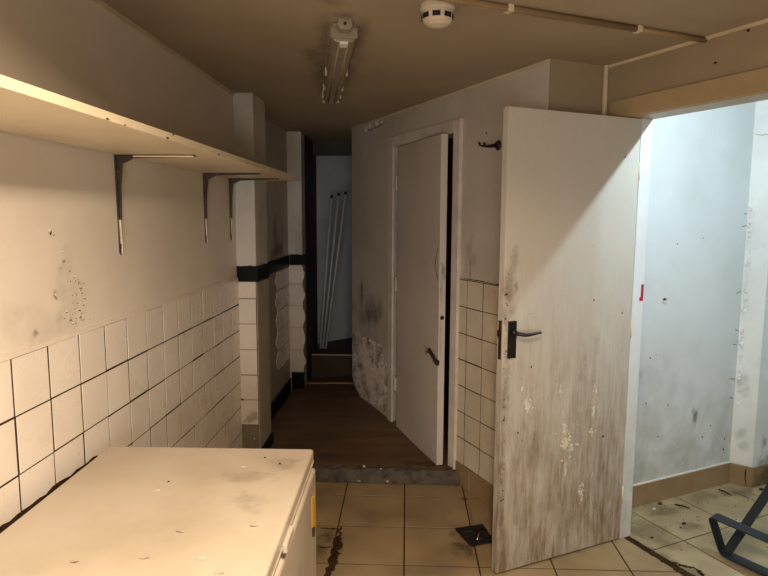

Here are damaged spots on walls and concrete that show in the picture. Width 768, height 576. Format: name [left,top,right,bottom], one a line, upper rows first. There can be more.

crack [316,526,343,576]